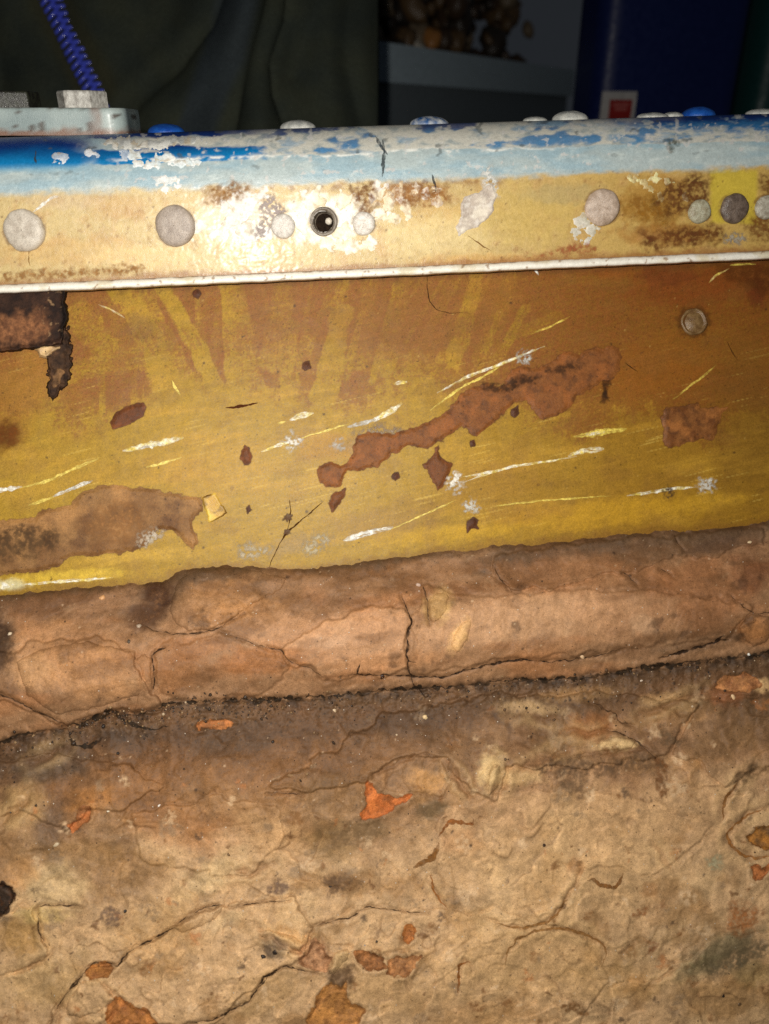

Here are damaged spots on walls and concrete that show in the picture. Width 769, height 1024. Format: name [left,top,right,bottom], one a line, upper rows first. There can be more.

peeling [52,152,69,164]
peeling [84,133,208,194]
corrosion [211,181,249,203]
corrosion [350,183,375,212]
corrosion [395,185,449,204]
corrosion [631,178,722,250]
peeling [0,485,227,575]
crack [269,500,321,567]
crack [0,587,769,757]
damp [539,755,668,799]
crack [57,901,283,1008]
crack [194,965,319,1024]